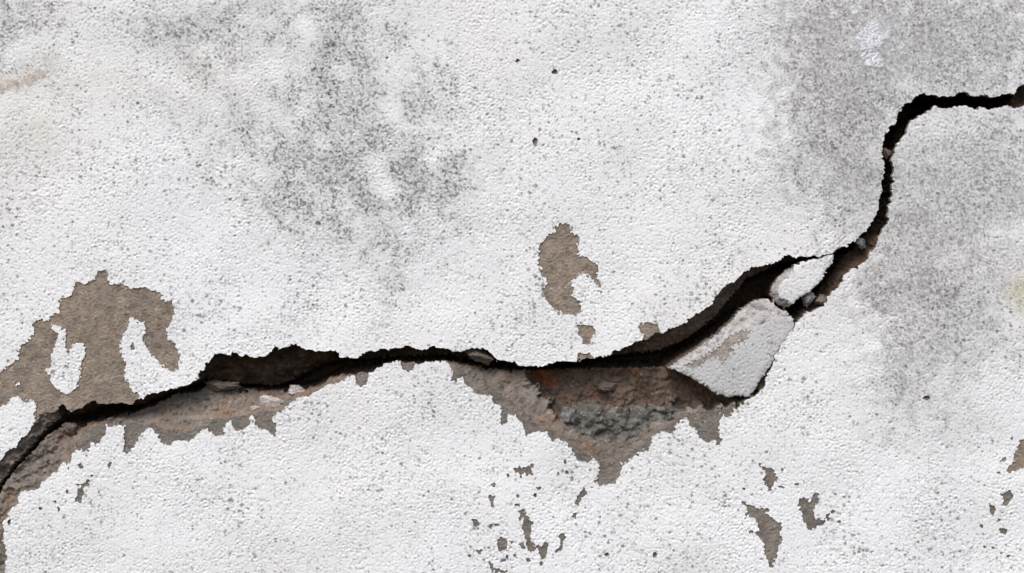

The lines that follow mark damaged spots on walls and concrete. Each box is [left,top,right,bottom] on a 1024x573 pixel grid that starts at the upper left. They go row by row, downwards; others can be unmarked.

crack [0,84,1024,493]
spalling [448,223,759,518]
peeling [0,270,369,573]
peeling [468,494,566,573]
peeling [741,488,783,568]
peeling [758,463,799,493]
peeling [797,492,841,530]